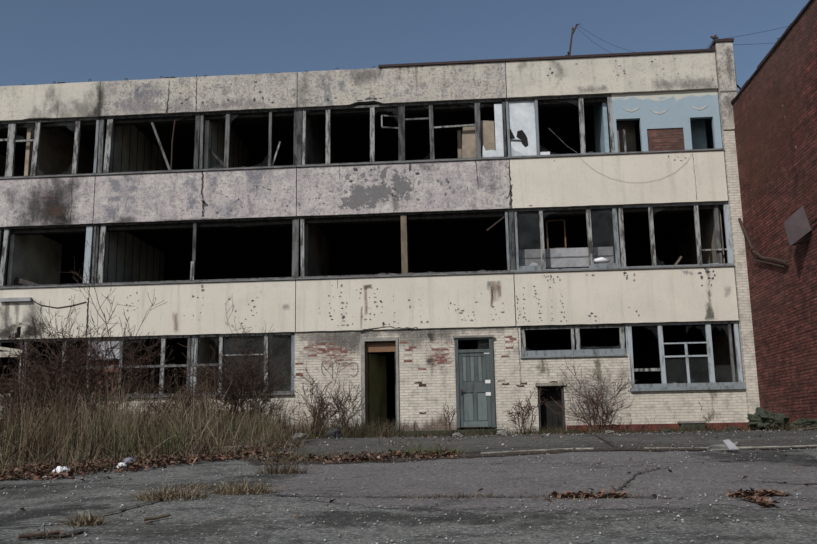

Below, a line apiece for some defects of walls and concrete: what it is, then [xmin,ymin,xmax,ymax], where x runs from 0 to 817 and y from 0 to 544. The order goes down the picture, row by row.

water stain [23,179,74,226]
crack [200,171,208,217]
peeling [338,163,420,211]
flaking render [295,342,355,376]
flaking render [399,338,450,370]